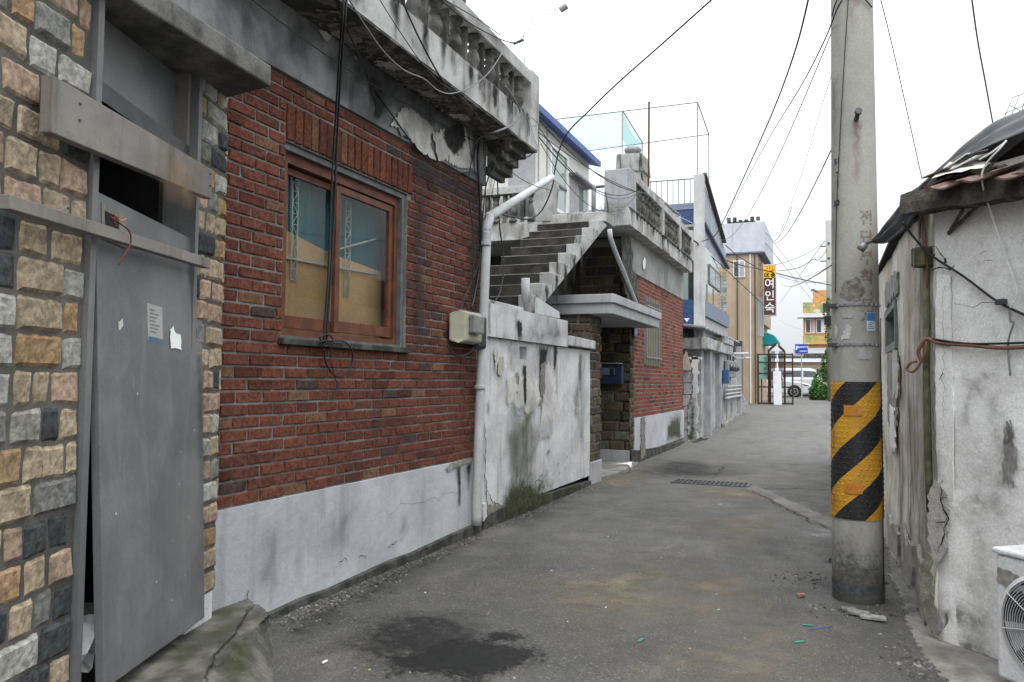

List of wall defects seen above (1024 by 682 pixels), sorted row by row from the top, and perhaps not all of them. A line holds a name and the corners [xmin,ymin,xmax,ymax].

peeling [297,4,528,169]
spalling [516,365,527,405]
crack [204,591,255,682]
spalling [887,480,950,640]